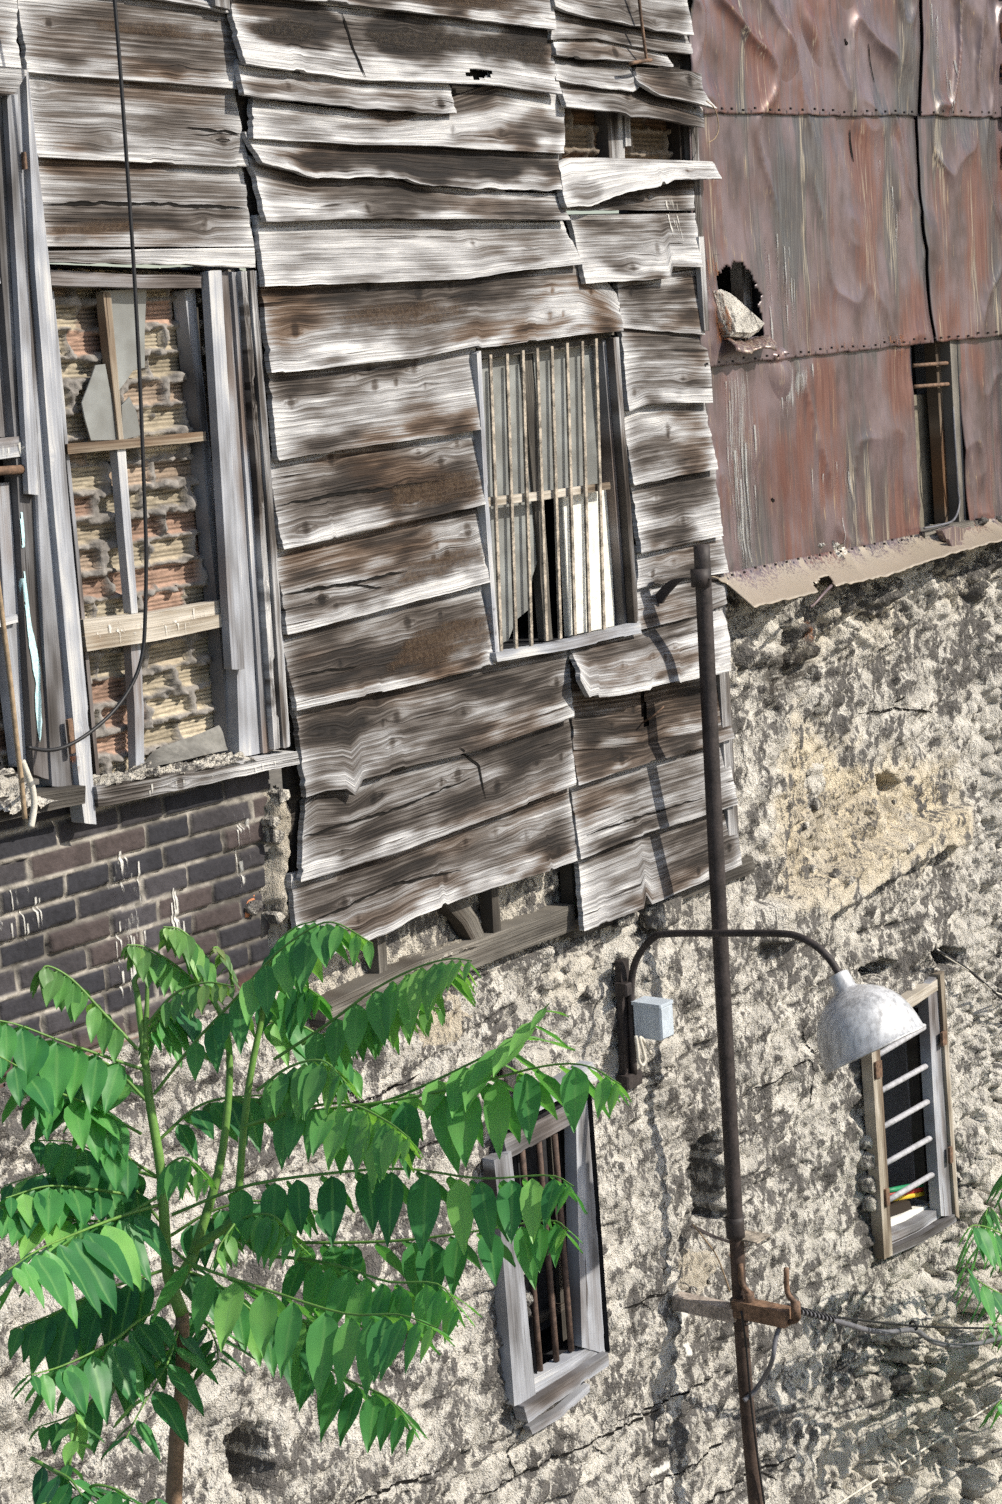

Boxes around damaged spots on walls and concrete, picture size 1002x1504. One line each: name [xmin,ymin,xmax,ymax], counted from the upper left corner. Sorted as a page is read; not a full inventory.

flaking render [966,674,1002,758]